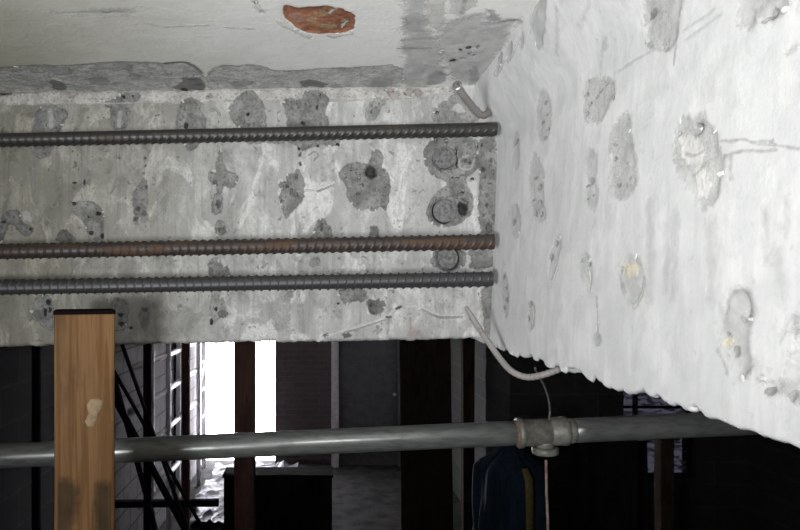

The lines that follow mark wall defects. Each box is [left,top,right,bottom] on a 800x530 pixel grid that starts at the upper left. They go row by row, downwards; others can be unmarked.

water stain [427,72,445,85]
spalling [678,118,724,199]
spalling [0,61,562,381]